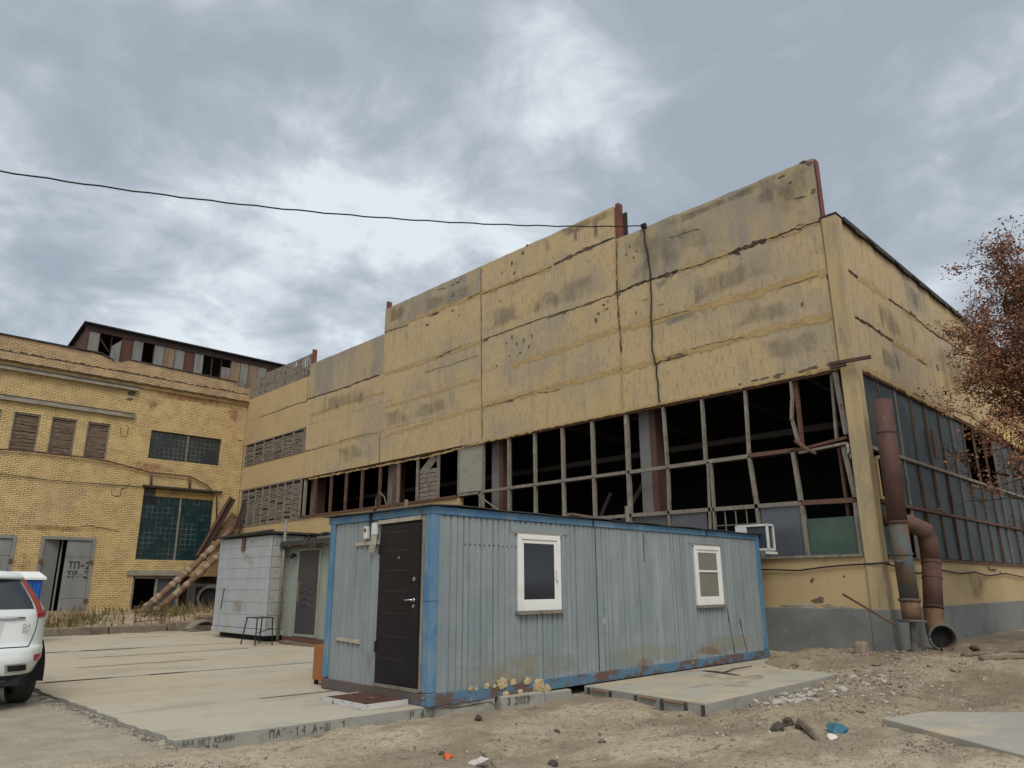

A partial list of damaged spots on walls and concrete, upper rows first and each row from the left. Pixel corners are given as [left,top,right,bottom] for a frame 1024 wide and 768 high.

crack [425,218,821,436]
crack [780,270,858,288]